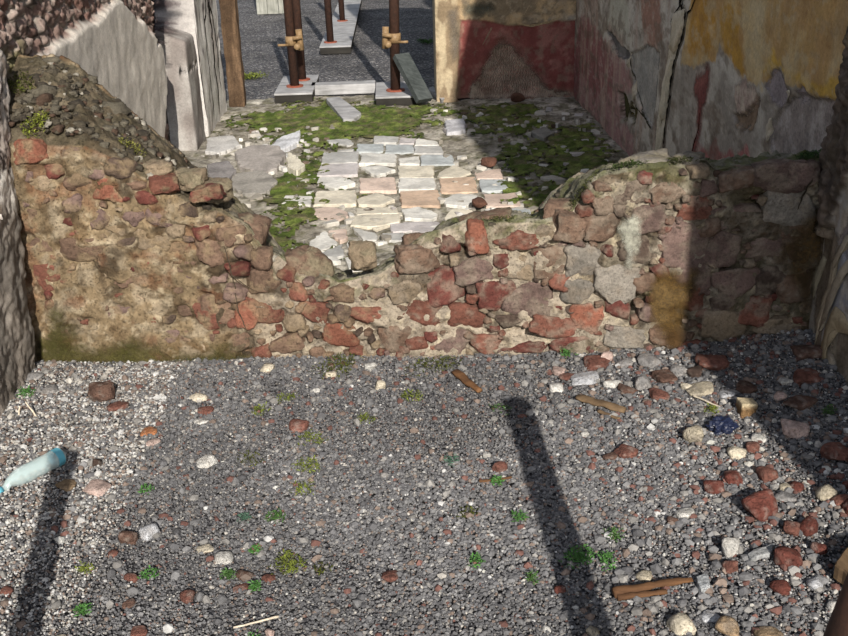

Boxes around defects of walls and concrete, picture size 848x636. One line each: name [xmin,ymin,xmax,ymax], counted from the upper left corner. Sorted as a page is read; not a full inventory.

spalling [608,5,688,150]
crack [630,0,695,148]
spalling [735,69,835,154]
leakage [650,270,698,349]
flaking render [811,223,848,385]